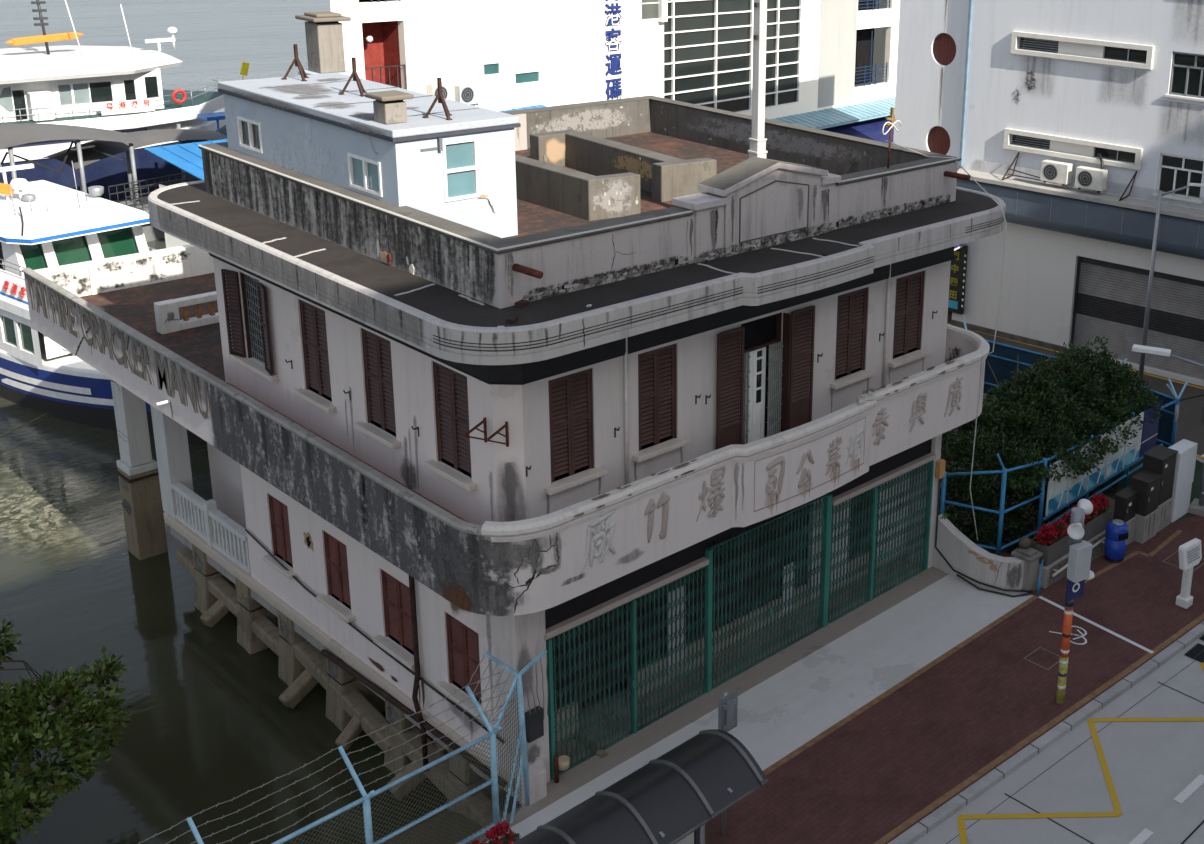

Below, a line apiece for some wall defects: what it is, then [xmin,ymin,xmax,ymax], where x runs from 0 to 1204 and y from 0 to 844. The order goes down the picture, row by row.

peeling [531,106,642,163]
damp [204,151,514,304]
peeling [592,155,652,214]
damp [711,198,734,248]
damp [813,185,829,221]
damp [123,332,530,616]
crack [509,532,560,613]